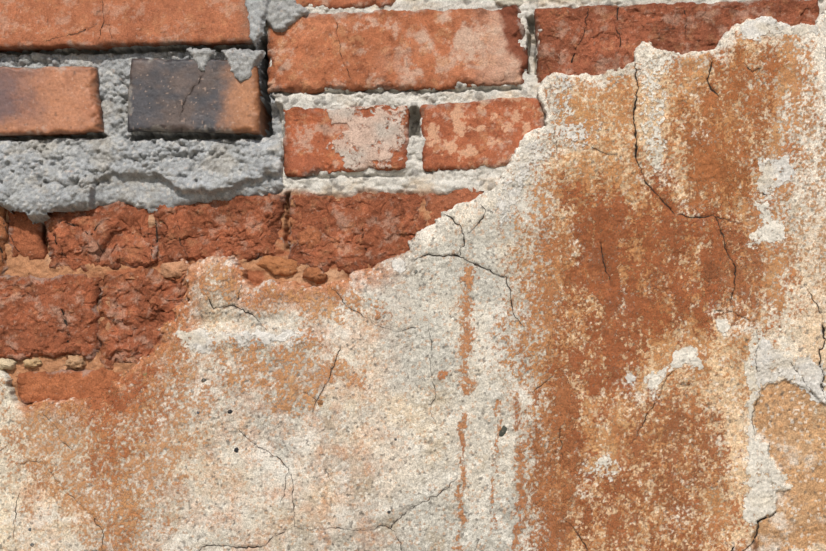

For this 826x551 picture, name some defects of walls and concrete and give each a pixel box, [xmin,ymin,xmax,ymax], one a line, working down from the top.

corrosion [0,259,390,551]
spalling [0,2,826,414]
corrosion [437,264,480,395]
crack [408,205,523,326]
crack [554,66,759,370]
corrosion [489,32,826,551]
crack [791,285,826,400]
crack [18,461,104,551]
crack [198,430,460,551]
corrosion [451,413,469,551]
crack [731,512,776,551]